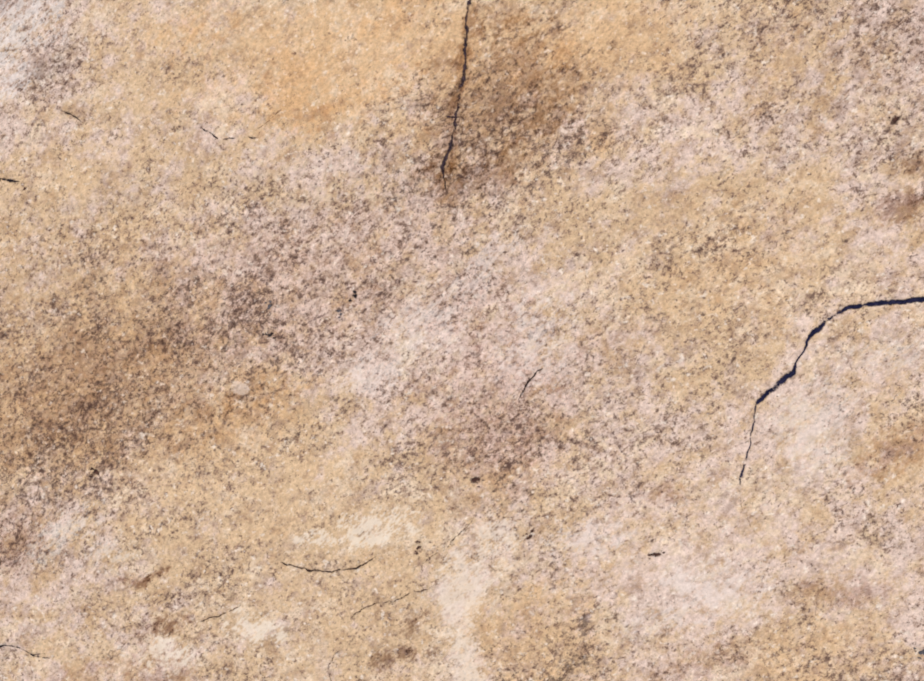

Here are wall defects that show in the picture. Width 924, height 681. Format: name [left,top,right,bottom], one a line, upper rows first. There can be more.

crack [440,0,471,189]
crack [739,297,924,536]